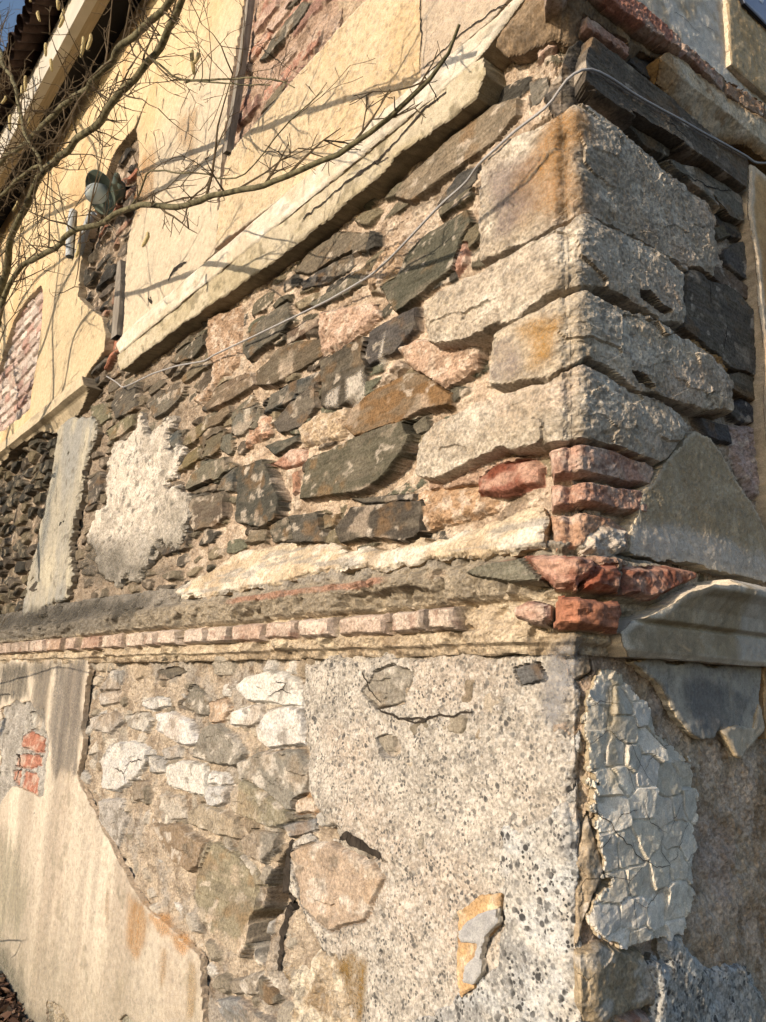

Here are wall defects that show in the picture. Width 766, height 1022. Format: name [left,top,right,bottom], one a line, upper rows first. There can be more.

spalling [0,693,52,804]
damp [0,663,83,775]
spalling [379,734,412,767]
spalling [442,715,482,739]
spalling [461,679,501,713]
spalling [78,656,376,1022]
crack [582,696,689,934]
peeling [553,645,766,1022]
spalling [46,999,70,1022]